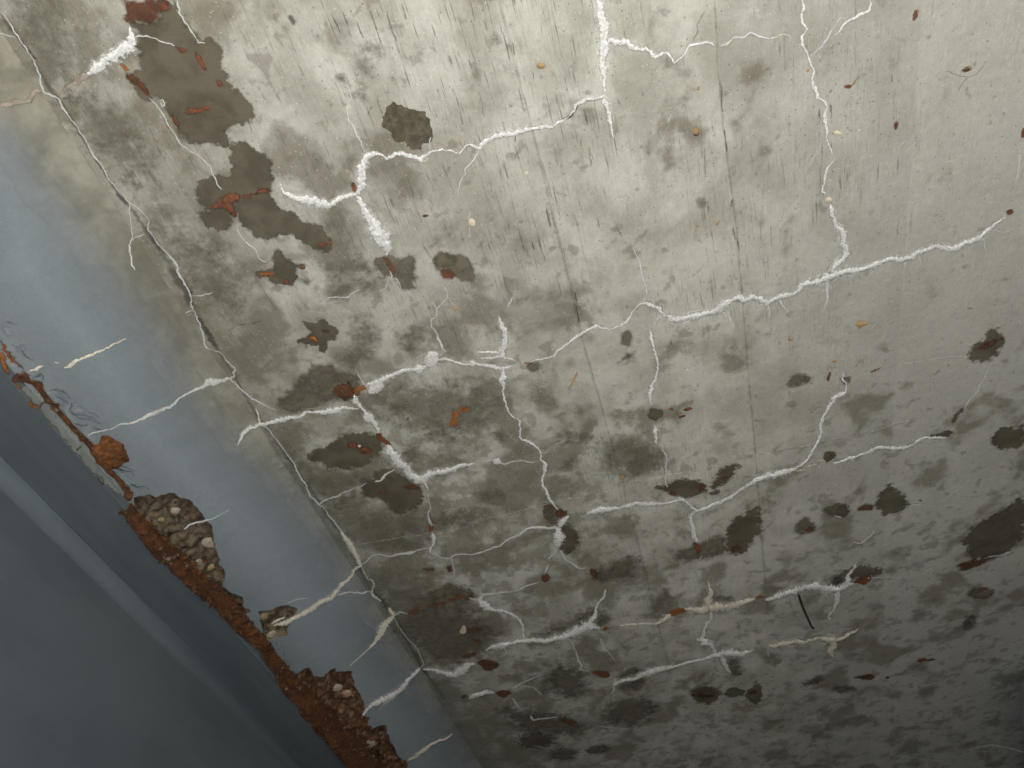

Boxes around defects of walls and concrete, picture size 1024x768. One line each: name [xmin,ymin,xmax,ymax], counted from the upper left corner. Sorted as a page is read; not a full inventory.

leakage [121,0,333,253]
leakage [278,319,366,412]
leakage [434,252,474,281]
crack [0,13,911,694]
crack [525,204,1021,409]
leakage [287,432,430,548]
leakage [655,464,742,498]
crack [833,436,947,464]
corrosion [0,341,383,768]
spalling [50,389,408,768]
crack [350,608,475,715]
crack [469,675,557,721]